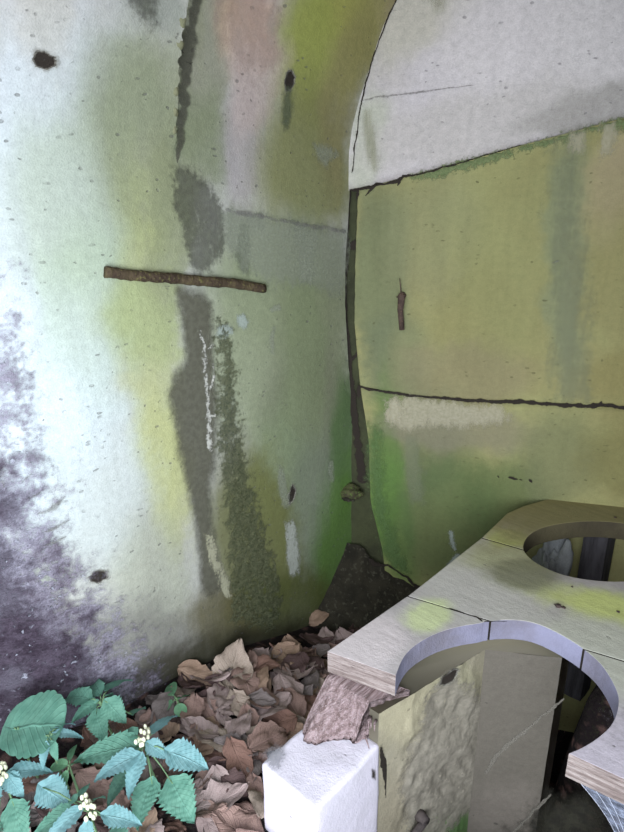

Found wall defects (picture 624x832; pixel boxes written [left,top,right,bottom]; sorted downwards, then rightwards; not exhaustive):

water stain [174,169,224,270]
water stain [169,288,233,595]
crack [237,145,624,483]